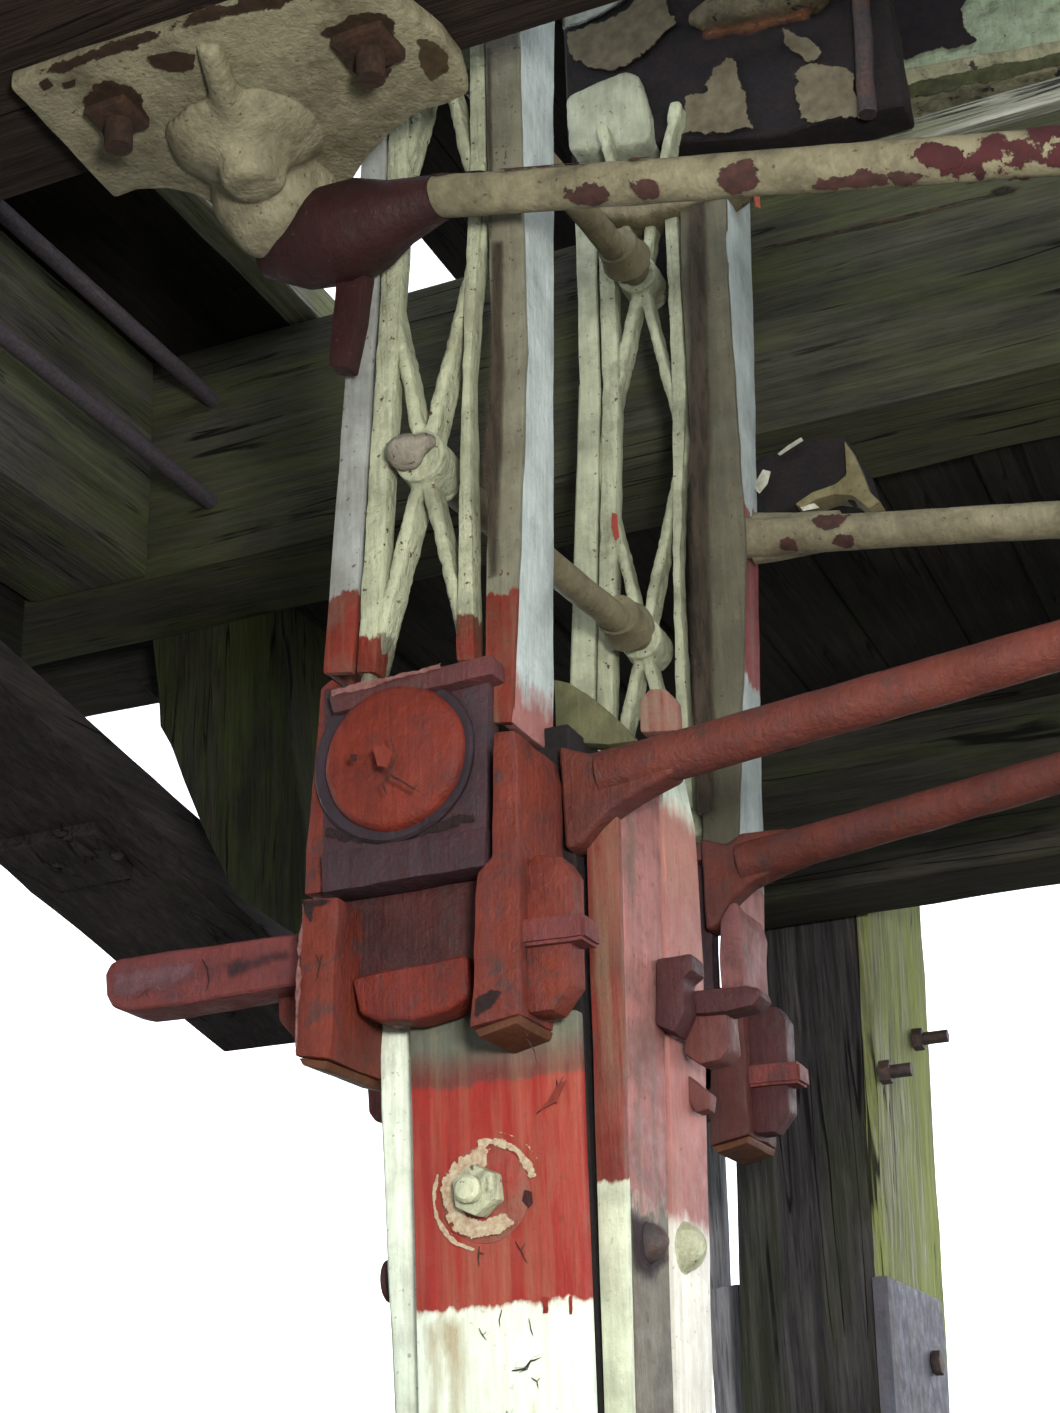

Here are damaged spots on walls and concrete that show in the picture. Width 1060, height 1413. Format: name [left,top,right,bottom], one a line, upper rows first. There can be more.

peeling [39,0,291,90]
peeling [564,0,676,71]
peeling [683,57,753,135]
peeling [782,28,859,123]
peeling [894,0,977,60]
peeling [415,162,610,207]
peeling [630,179,660,200]
peeling [717,158,760,195]
peeling [432,1131,537,1251]